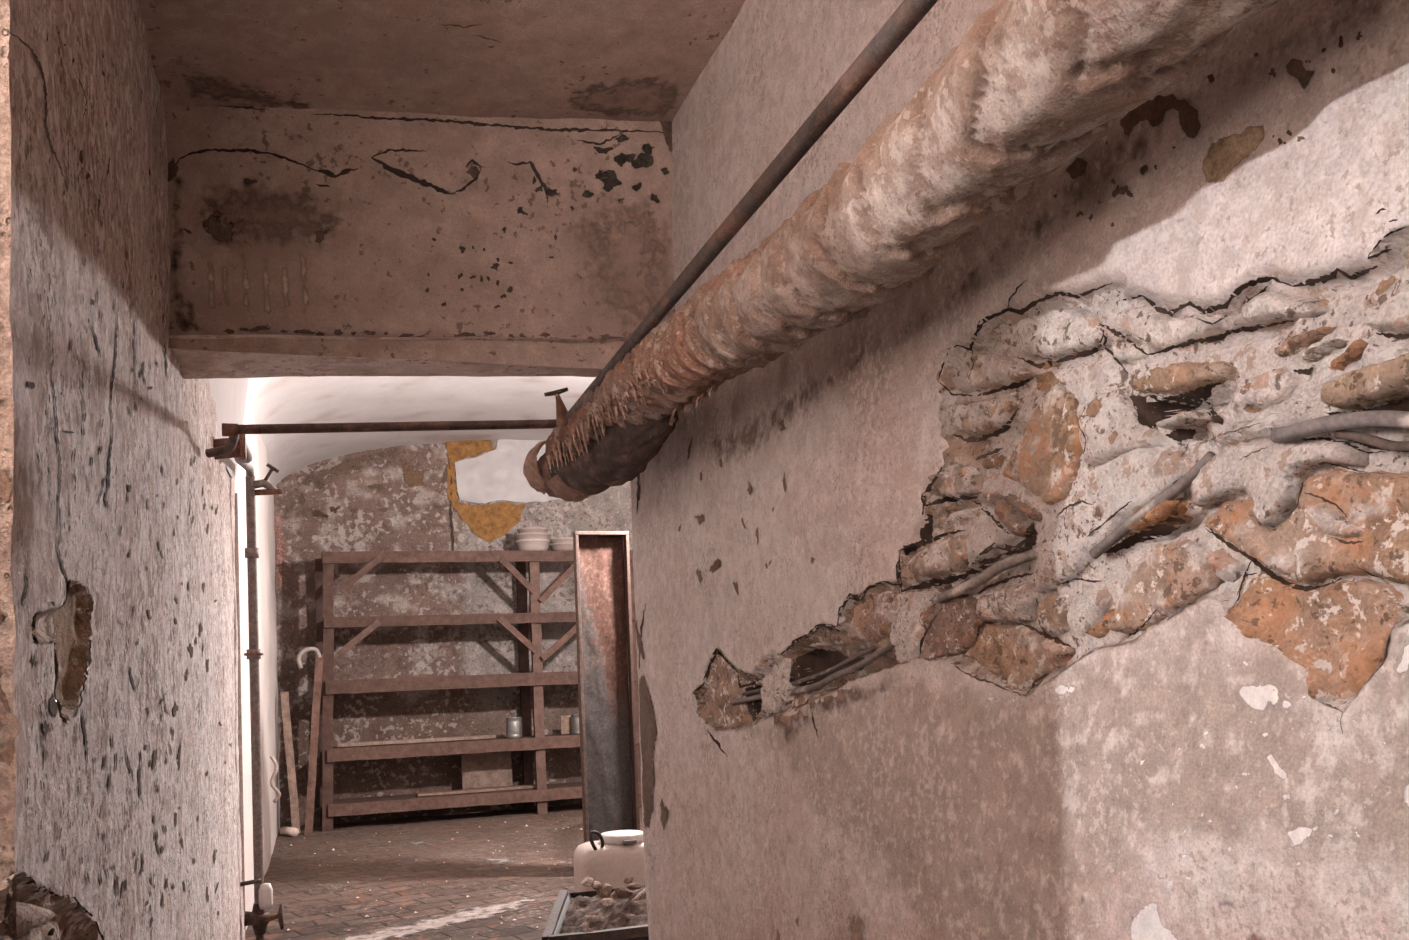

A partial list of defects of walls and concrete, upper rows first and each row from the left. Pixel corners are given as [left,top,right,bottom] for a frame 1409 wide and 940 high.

peeling [1269,31,1363,89]
crack [8,31,87,192]
crack [220,104,269,112]
crack [168,114,673,202]
peeling [1120,94,1305,183]
flaking render [433,440,526,542]
flaking render [692,225,1409,731]
peeling [185,622,209,681]
flaking render [0,579,151,830]
peeling [46,699,195,927]
peeling [1287,826,1333,866]
flaking render [0,871,98,940]